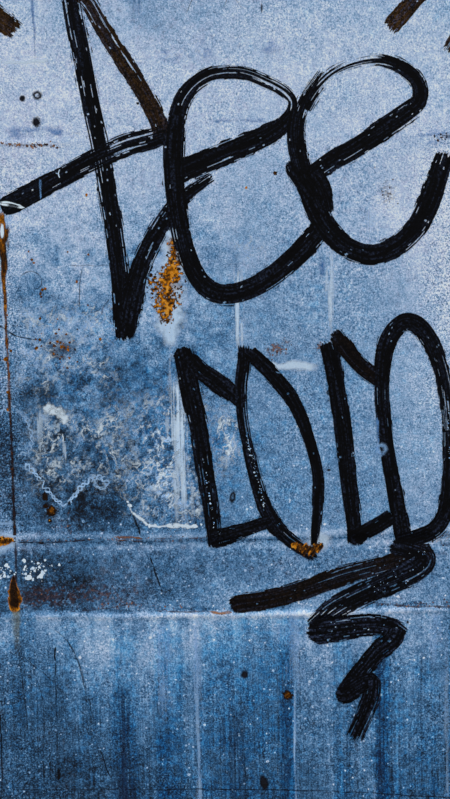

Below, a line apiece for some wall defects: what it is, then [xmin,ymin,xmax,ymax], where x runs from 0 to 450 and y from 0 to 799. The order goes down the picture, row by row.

water stain [0,404,124,507]
corrosion [0,213,190,626]
water stain [126,380,202,529]
corrosion [291,532,333,556]